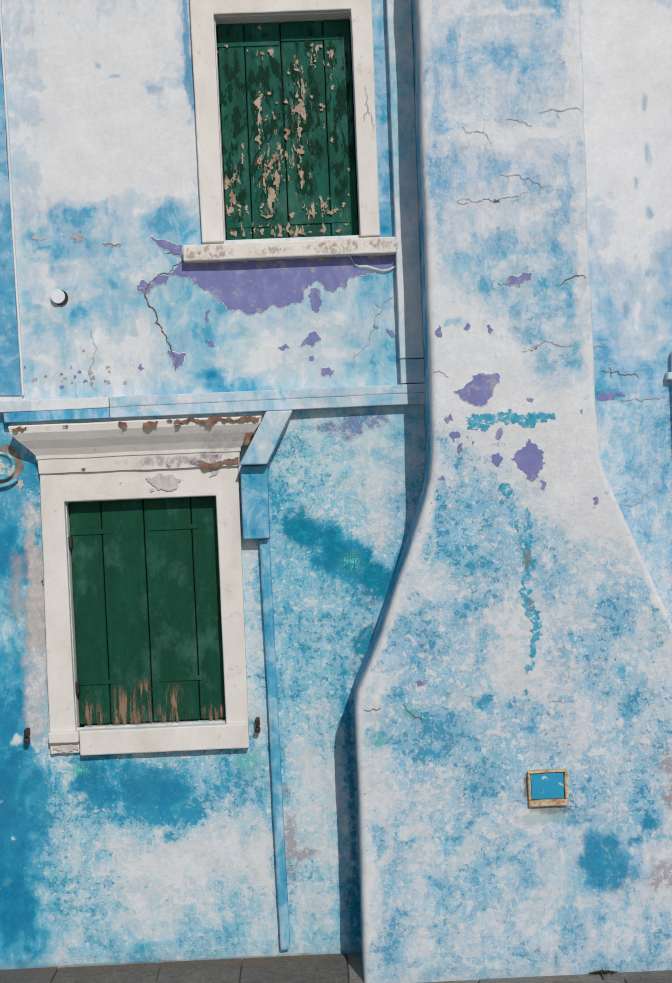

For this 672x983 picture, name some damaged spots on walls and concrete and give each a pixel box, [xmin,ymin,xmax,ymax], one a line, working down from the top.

crack [506,107,581,126]
crack [457,174,552,204]
peeling [139,236,396,323]
crack [136,252,187,372]
peeling [278,330,335,378]
flaking render [143,416,262,445]
peeling [444,372,556,490]
flaking render [0,444,26,492]
flaking render [190,454,239,477]